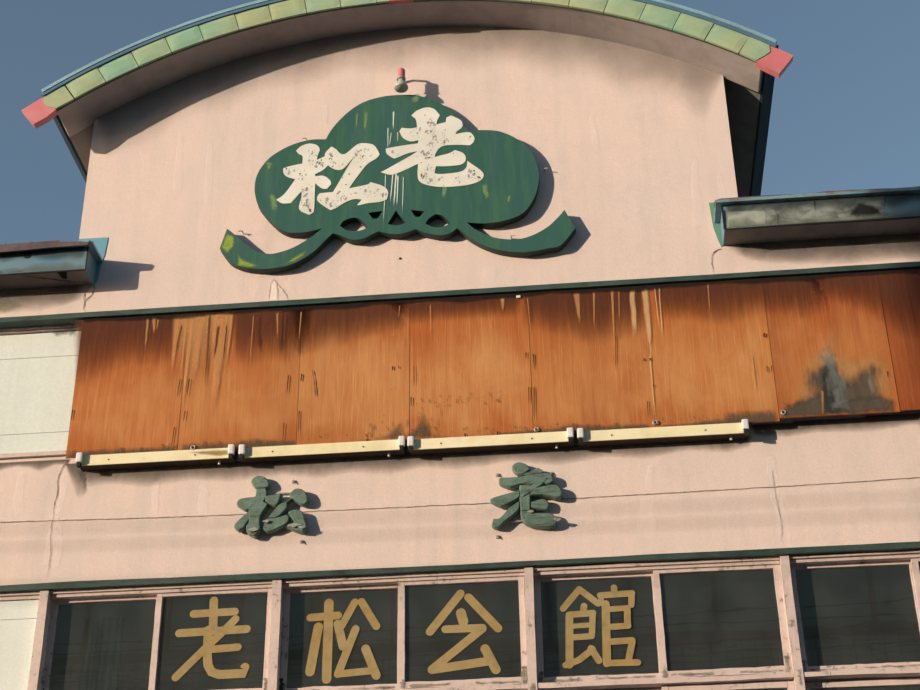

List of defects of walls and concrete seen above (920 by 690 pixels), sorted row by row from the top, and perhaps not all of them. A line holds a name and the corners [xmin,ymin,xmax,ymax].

water stain [784,364,893,417]
water stain [665,412,775,426]
crack [0,461,95,569]
crack [118,512,245,520]
crack [287,503,486,513]
crack [518,472,920,541]